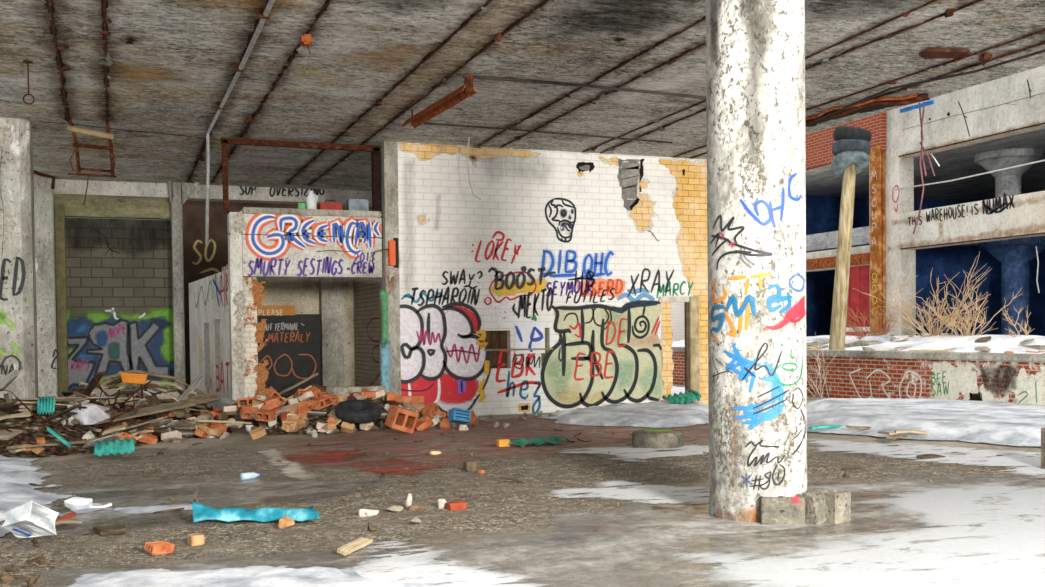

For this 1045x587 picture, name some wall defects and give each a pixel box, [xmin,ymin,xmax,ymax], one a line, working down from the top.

rust [300,34,313,54]
spalling [285,0,557,187]
peeling [397,16,706,167]
spalling [805,0,984,70]
rust [919,49,992,66]
spalling [576,100,706,233]
flaking render [233,279,269,397]
peeling [931,361,1045,405]